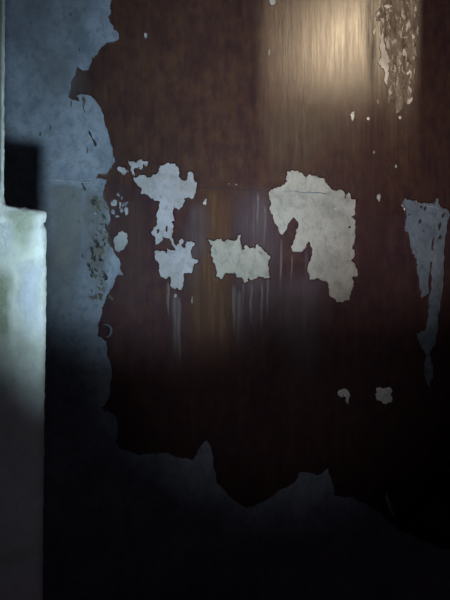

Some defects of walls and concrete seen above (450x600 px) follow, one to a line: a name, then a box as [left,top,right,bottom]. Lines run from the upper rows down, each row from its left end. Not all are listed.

peeling [68,0,120,229]
peeling [372,0,419,119]
peeling [112,230,129,254]
peeling [116,158,200,292]
peeling [207,234,272,284]
peeling [267,169,359,304]
peeling [401,197,450,392]
peeling [97,252,450,549]